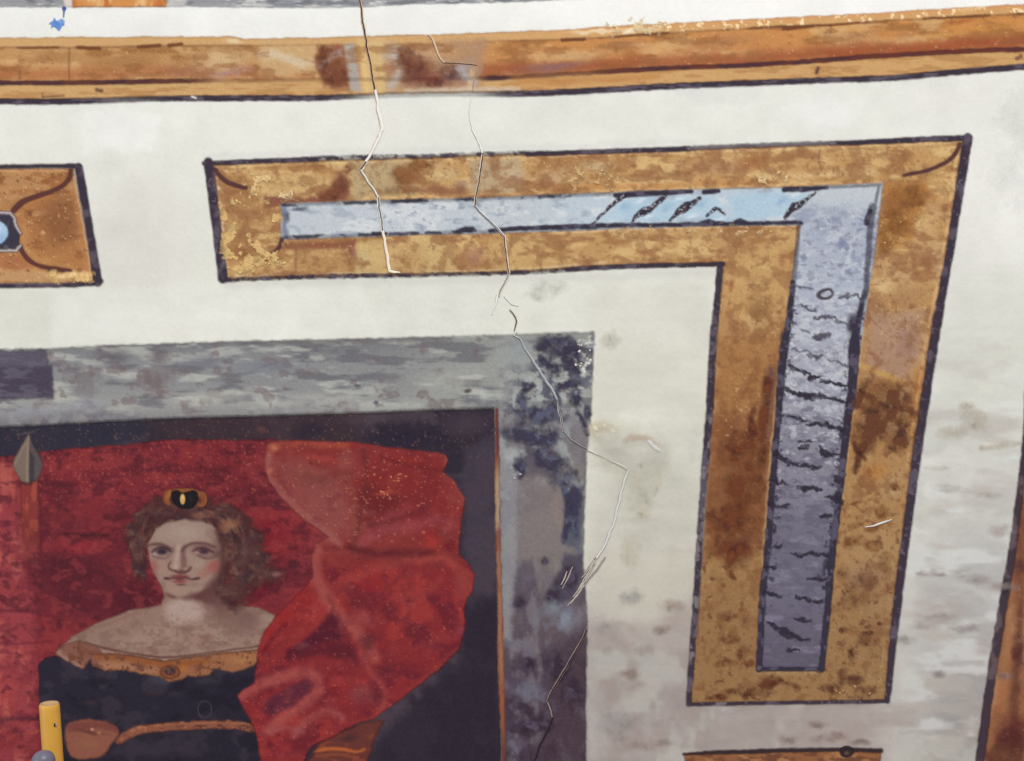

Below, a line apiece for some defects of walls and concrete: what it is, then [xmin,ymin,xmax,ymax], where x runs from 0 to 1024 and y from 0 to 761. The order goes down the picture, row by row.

crack [359,0,400,274]
peeling [220,172,293,275]
crack [428,34,630,591]
damp [503,383,582,543]
damp [535,336,591,436]
crack [533,629,588,761]